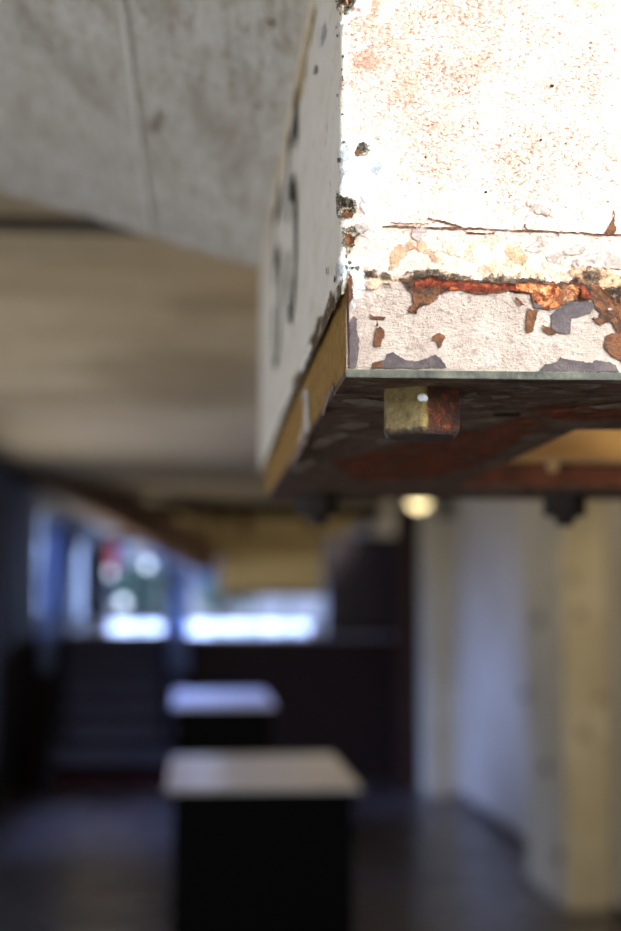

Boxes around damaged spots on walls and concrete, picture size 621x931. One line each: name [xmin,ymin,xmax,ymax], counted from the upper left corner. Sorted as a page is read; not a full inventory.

spalling [335,0,371,37]
crack [382,217,621,237]
peeling [265,132,400,474]
corrosion [361,266,621,360]
peeling [533,301,595,334]
peeling [372,352,446,369]
peeling [540,357,619,372]